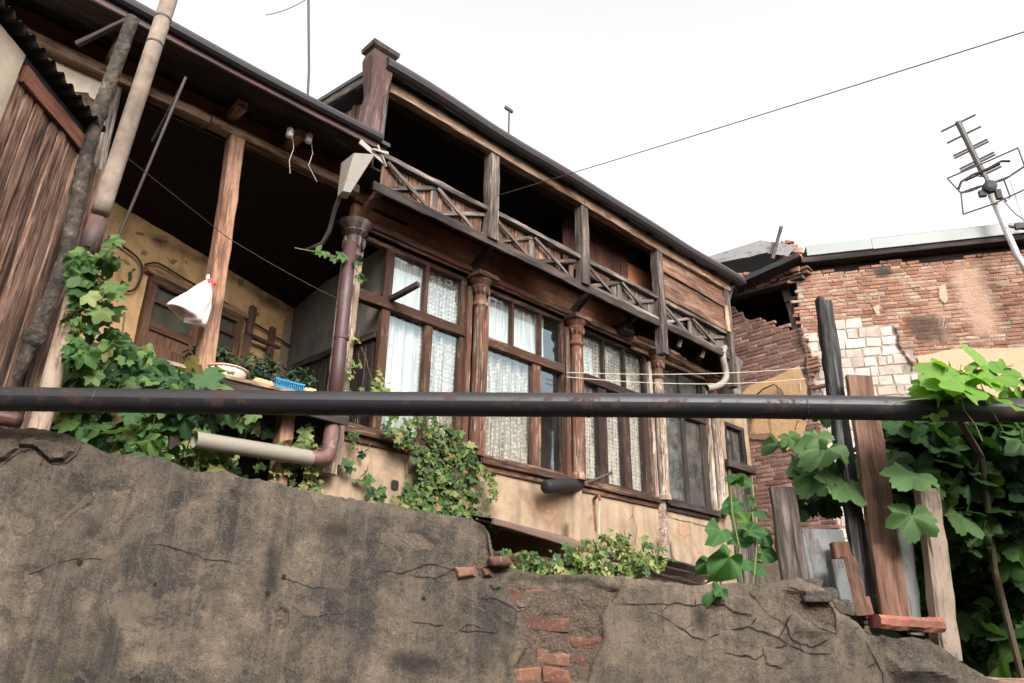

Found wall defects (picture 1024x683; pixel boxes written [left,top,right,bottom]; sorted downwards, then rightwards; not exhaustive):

crack [0,445,81,468]
crack [22,550,97,578]
crack [150,540,235,568]
crack [378,523,530,612]
spalling [455,533,619,683]
crack [616,587,838,660]
crack [866,642,884,683]